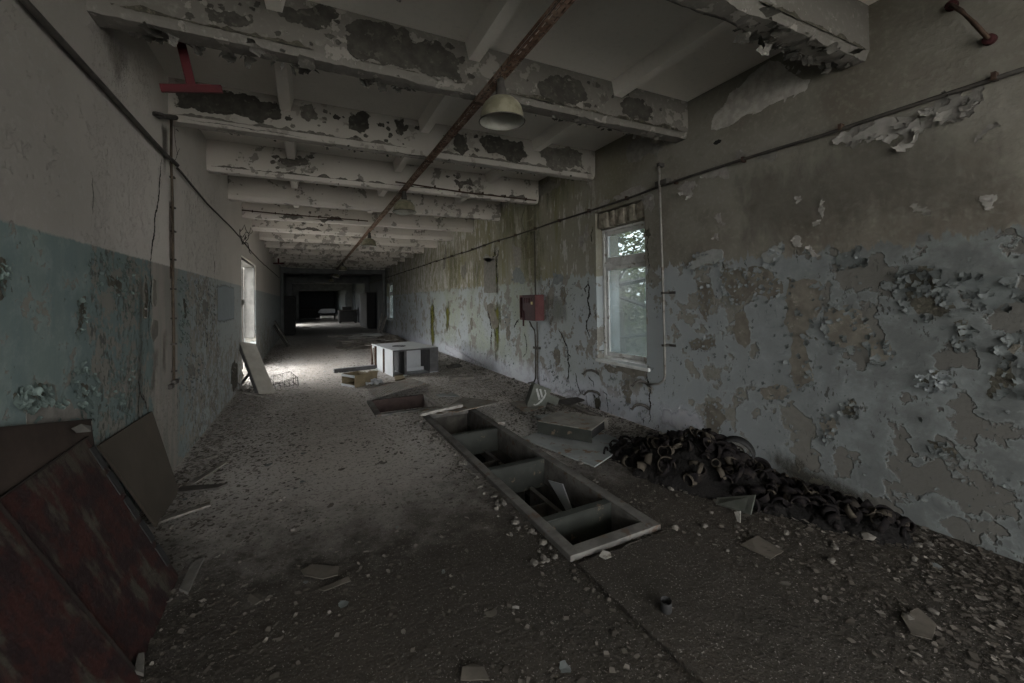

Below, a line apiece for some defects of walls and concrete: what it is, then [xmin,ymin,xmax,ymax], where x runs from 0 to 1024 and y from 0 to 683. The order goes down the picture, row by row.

peeling [711,1,866,130]
peeling [509,75,683,143]
peeling [832,85,985,152]
flaking render [231,360,240,392]
crack [559,284,608,407]
peeling [681,213,833,417]
peeling [914,369,953,394]
peeling [881,256,1024,353]
peeling [986,331,1024,414]
peeling [703,401,731,434]
peeling [813,398,860,455]